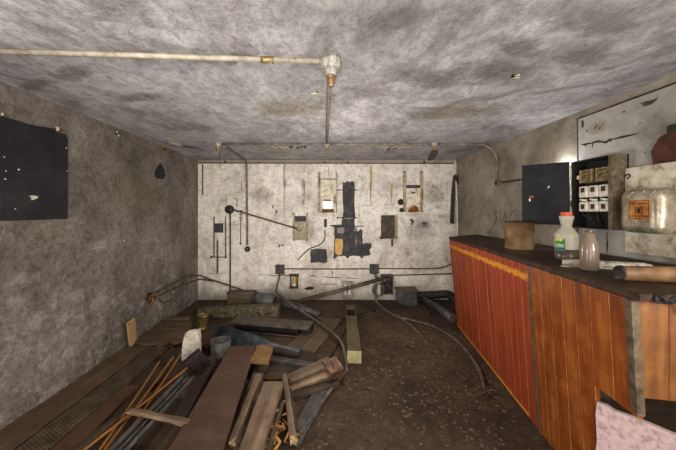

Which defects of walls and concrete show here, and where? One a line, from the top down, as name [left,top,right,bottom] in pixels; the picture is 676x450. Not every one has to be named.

peeling [303,181,372,264]